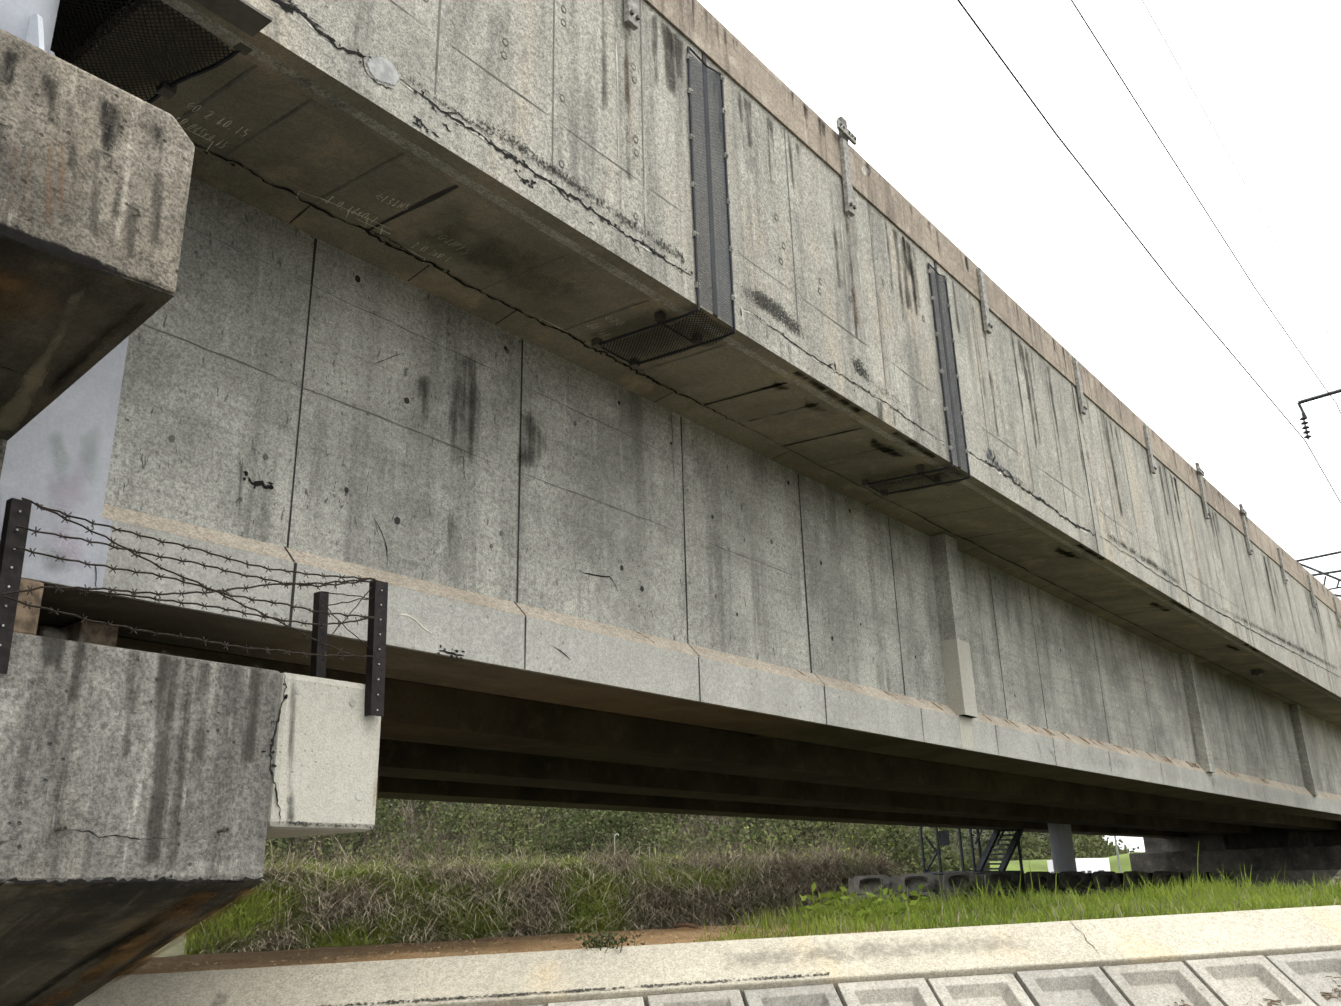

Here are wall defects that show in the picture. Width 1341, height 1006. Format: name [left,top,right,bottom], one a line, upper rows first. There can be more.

damp [5,51,16,83]
damp [46,77,56,105]
damp [102,101,116,169]
crack [270,0,693,276]
damp [653,18,682,92]
damp [835,221,866,337]
damp [884,229,920,388]
damp [0,304,142,430]
damp [452,362,476,453]
damp [520,414,540,463]
crack [193,142,1340,723]
crack [77,830,166,840]